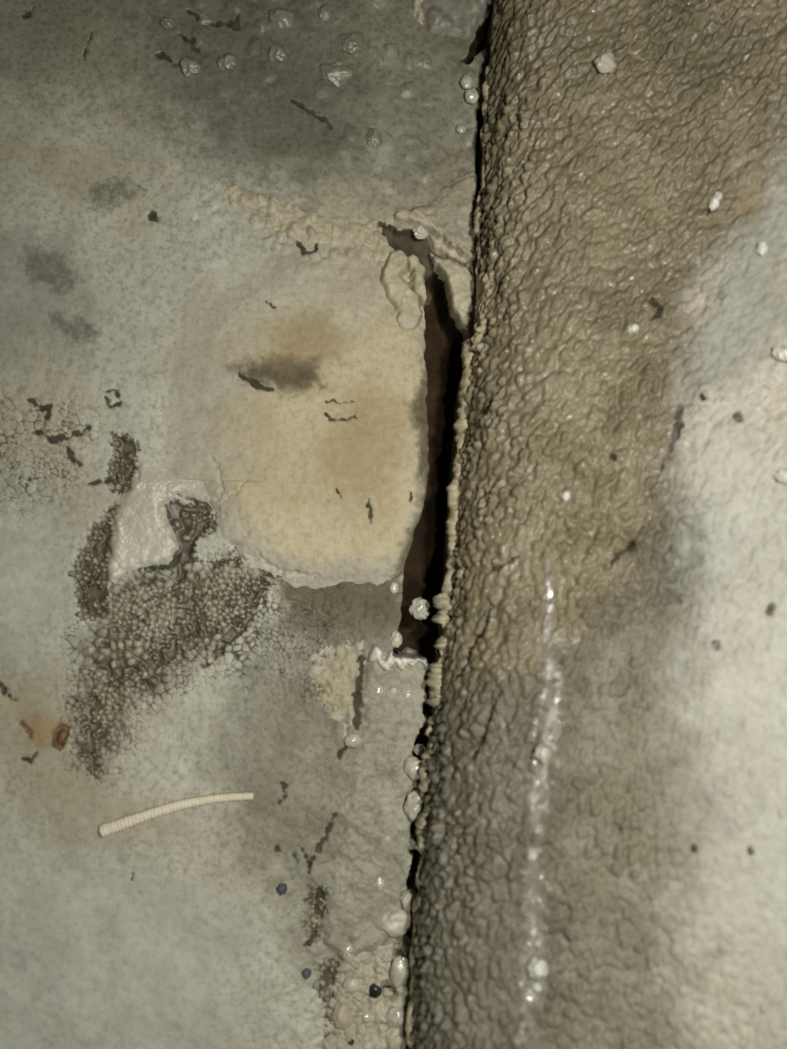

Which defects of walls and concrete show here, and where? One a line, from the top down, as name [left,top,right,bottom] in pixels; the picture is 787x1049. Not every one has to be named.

leakage [0,0,496,374]
crack [27,398,113,485]
crack [105,389,122,408]
leakage [239,359,317,392]
crack [139,554,181,571]
crack [365,500,373,523]
leakage [410,0,787,1049]
spalling [60,431,348,792]
corrosion [52,723,71,751]
leakage [241,575,430,1049]